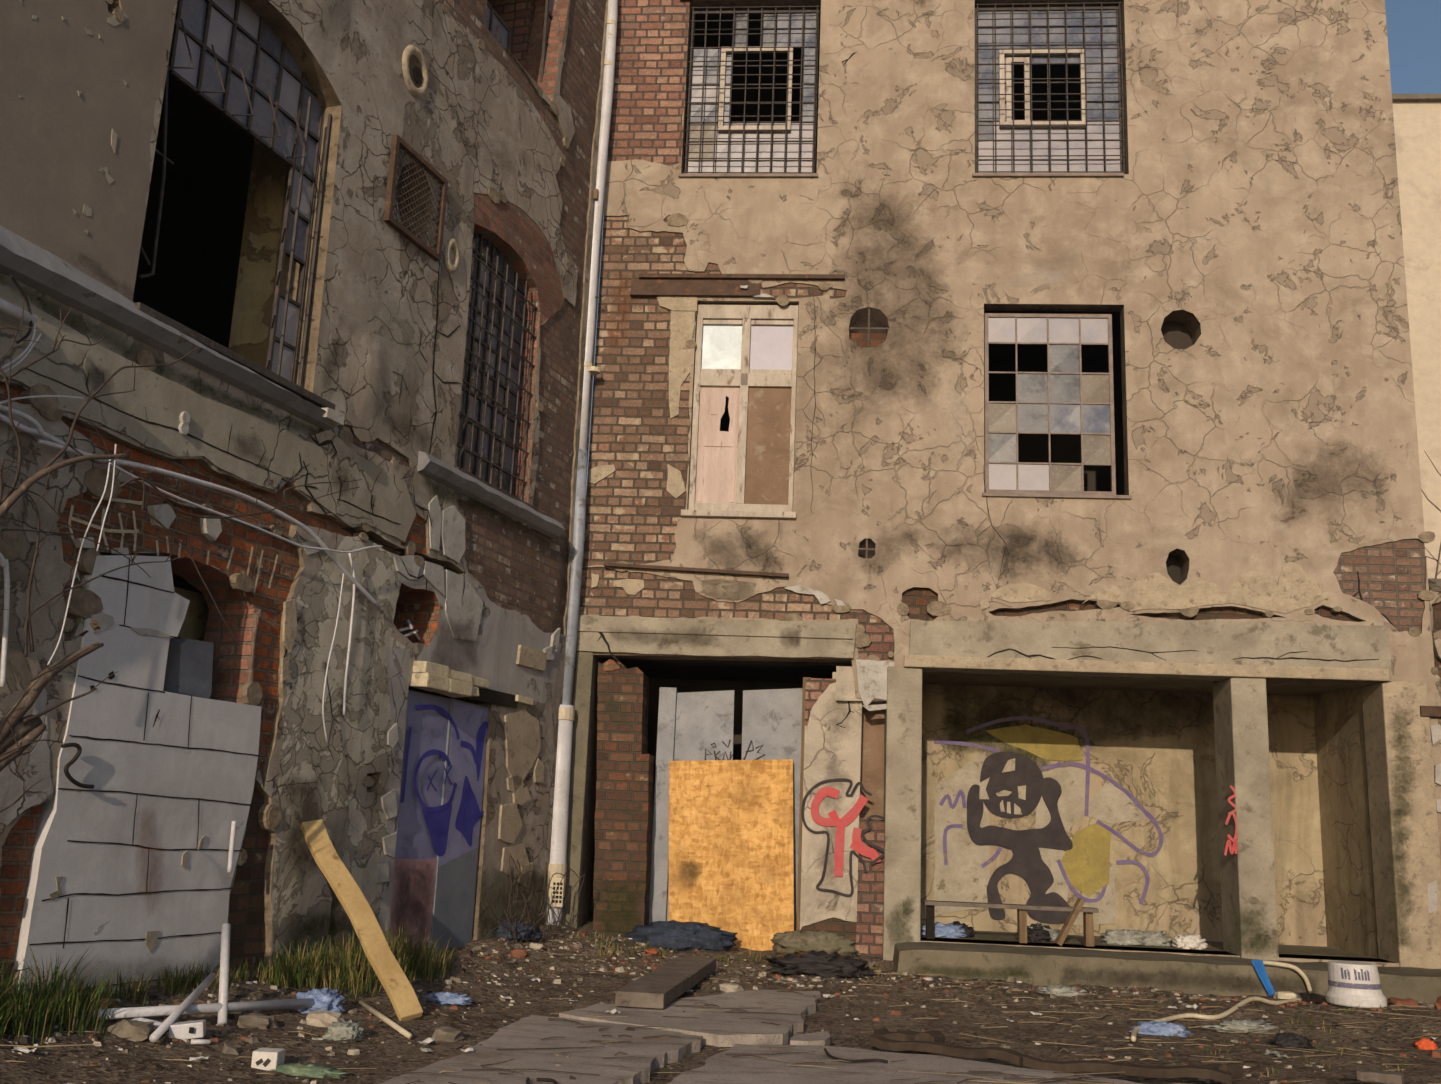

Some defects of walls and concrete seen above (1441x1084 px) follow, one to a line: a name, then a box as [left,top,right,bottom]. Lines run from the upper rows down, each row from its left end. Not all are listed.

crack [26,368,465,609]
crack [325,662,341,760]
crack [368,261,461,455]
flaking render [0,0,952,989]
crack [811,303,825,512]
crack [979,467,1006,572]
peeling [979,531,1441,636]
flaking render [1431,650,1441,678]